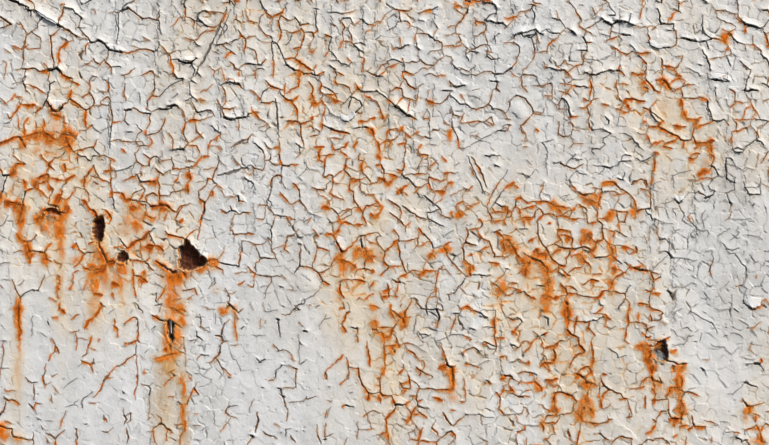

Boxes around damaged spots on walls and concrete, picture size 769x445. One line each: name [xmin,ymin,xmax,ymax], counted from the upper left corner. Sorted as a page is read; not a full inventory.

crack [0,0,269,240]
crack [16,233,52,264]
corrosion [16,200,69,257]
corrosion [87,251,134,304]
crack [113,228,175,313]
corrosion [336,248,373,272]
corrosion [507,237,554,313]
corrosion [590,193,615,221]
crack [13,278,59,421]
crack [71,280,140,372]
crack [147,283,243,444]
corrosion [635,343,658,381]